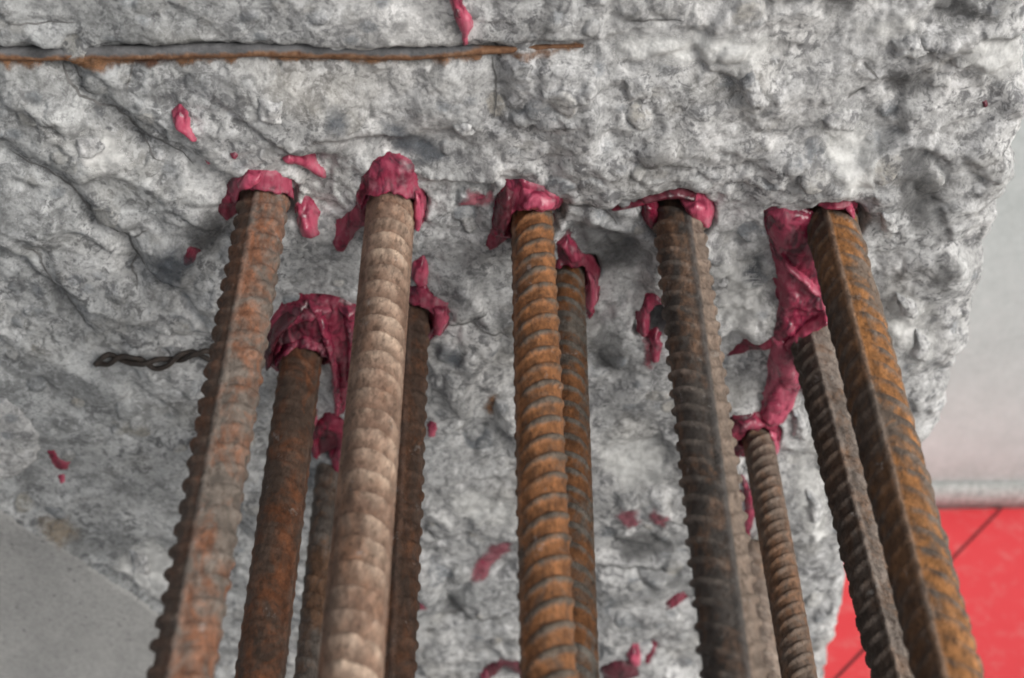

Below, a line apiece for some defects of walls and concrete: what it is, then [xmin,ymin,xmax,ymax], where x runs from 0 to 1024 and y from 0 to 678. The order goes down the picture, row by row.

corrosion [0,60,43,69]
crack [63,62,193,163]
corrosion [65,57,239,72]
spalling [257,98,283,125]
corrosion [432,55,483,63]
spalling [623,75,652,101]
spalling [731,68,769,110]
crack [11,150,180,291]
crack [22,245,97,333]
spalling [214,366,279,678]
spalling [285,451,332,678]
spalling [777,388,846,678]